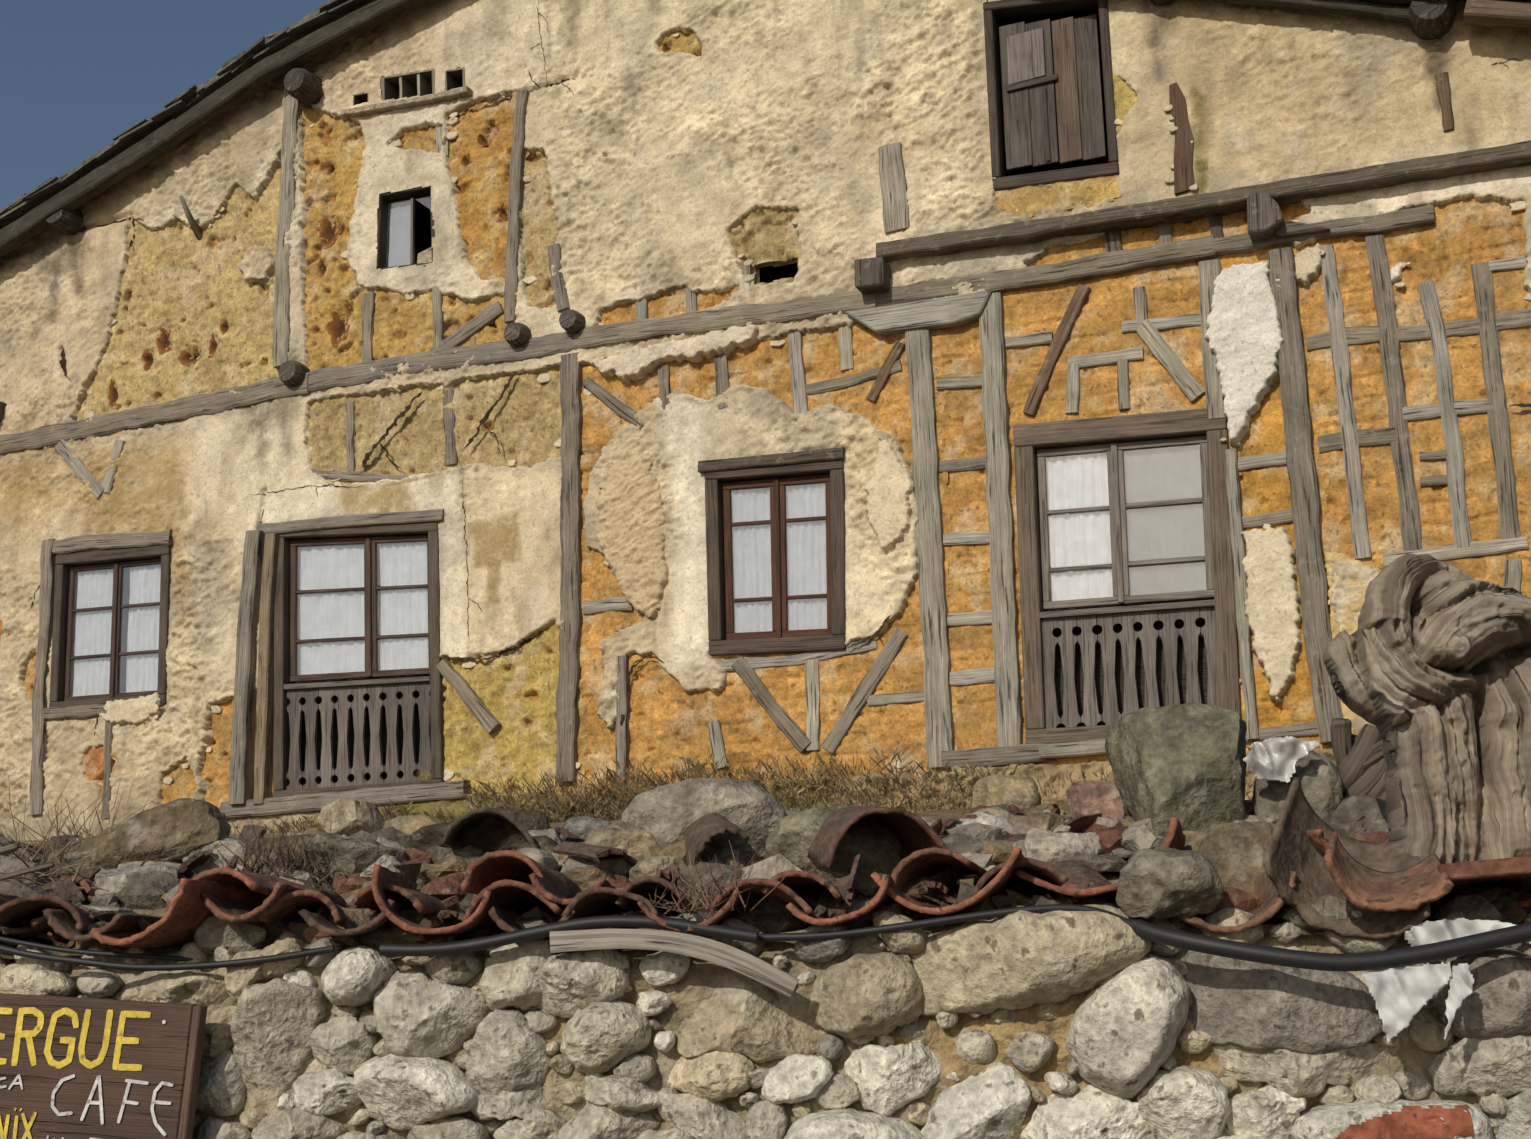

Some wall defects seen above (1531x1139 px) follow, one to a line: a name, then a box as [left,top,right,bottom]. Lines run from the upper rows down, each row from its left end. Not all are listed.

flaking render [659,31,702,56]
peeling [76,166,281,421]
peeling [301,91,559,371]
flaking render [599,207,803,325]
peeling [305,367,562,486]
peeling [442,322,952,796]
peeling [931,320,998,750]
peeling [1001,196,1531,757]
peeling [161,698,233,809]
peeling [1036,755,1108,767]